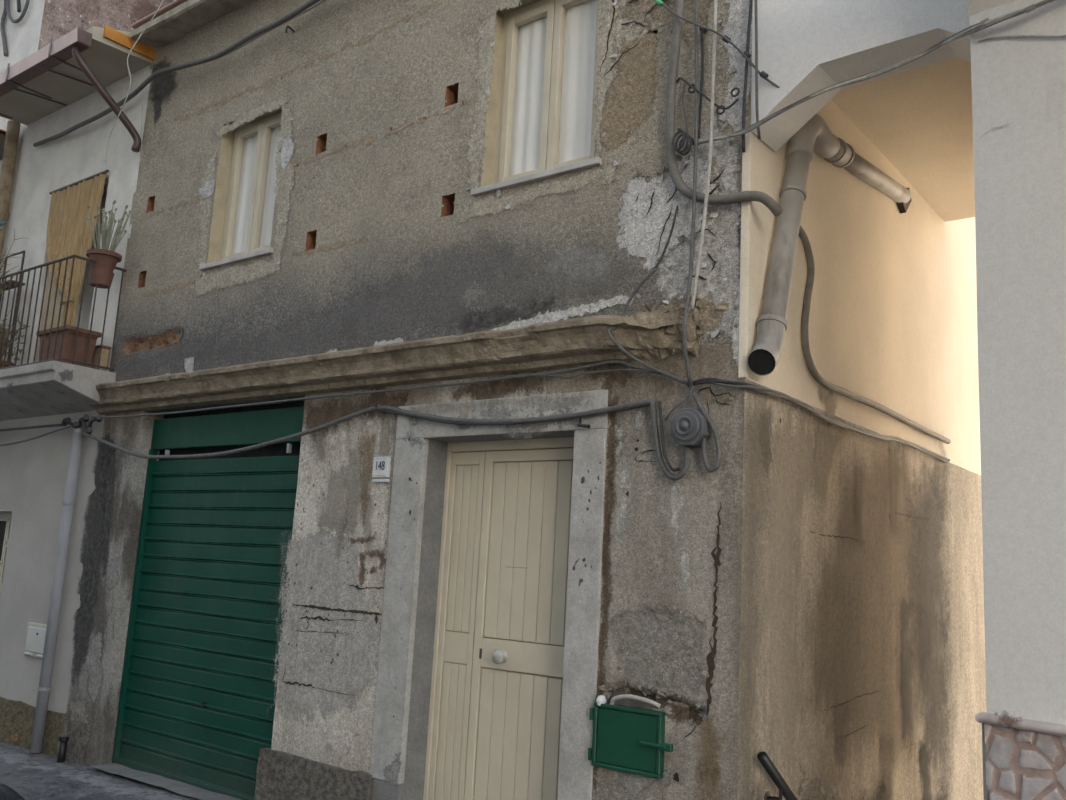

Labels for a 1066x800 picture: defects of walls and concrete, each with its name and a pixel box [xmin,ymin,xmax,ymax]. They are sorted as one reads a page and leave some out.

peeling [489,0,753,372]
flaking render [123,326,184,357]
peeling [373,337,404,346]
crack [666,502,722,739]
damp [901,465,949,800]